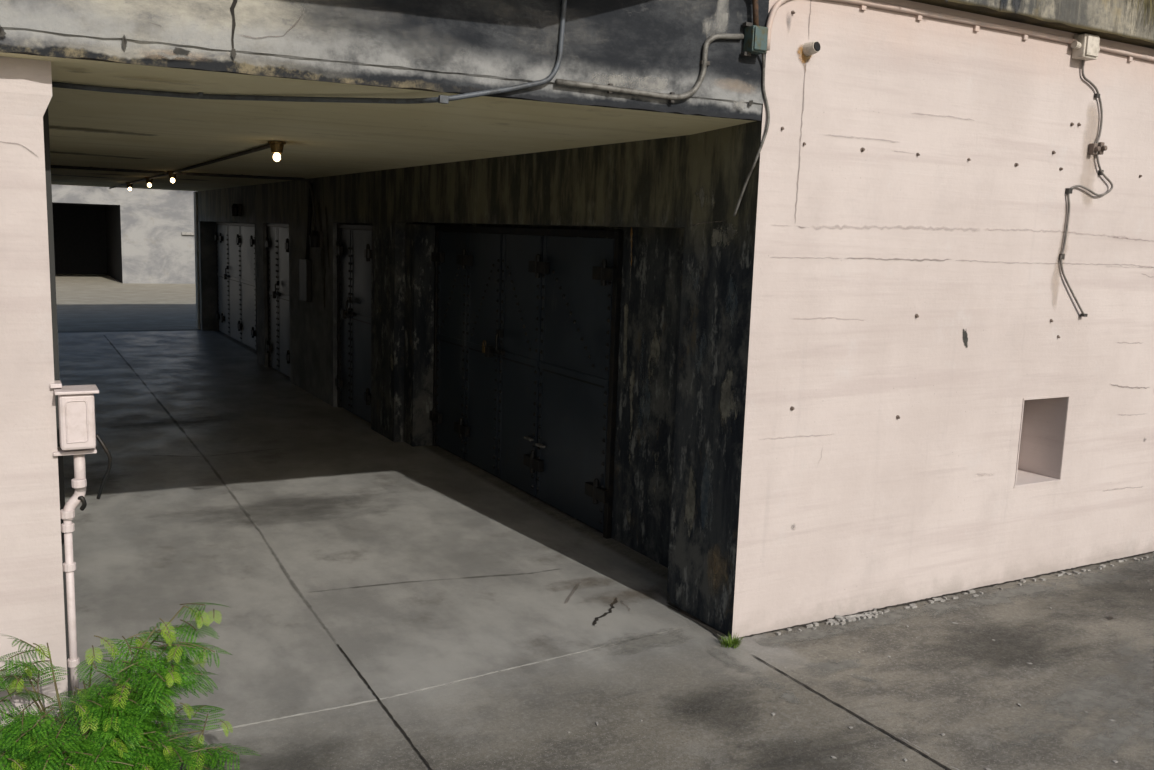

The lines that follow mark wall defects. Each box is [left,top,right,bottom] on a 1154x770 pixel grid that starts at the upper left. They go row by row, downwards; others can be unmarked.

crack [229,0,237,59]
water stain [705,0,728,33]
water stain [1001,0,1021,13]
water stain [596,74,666,90]